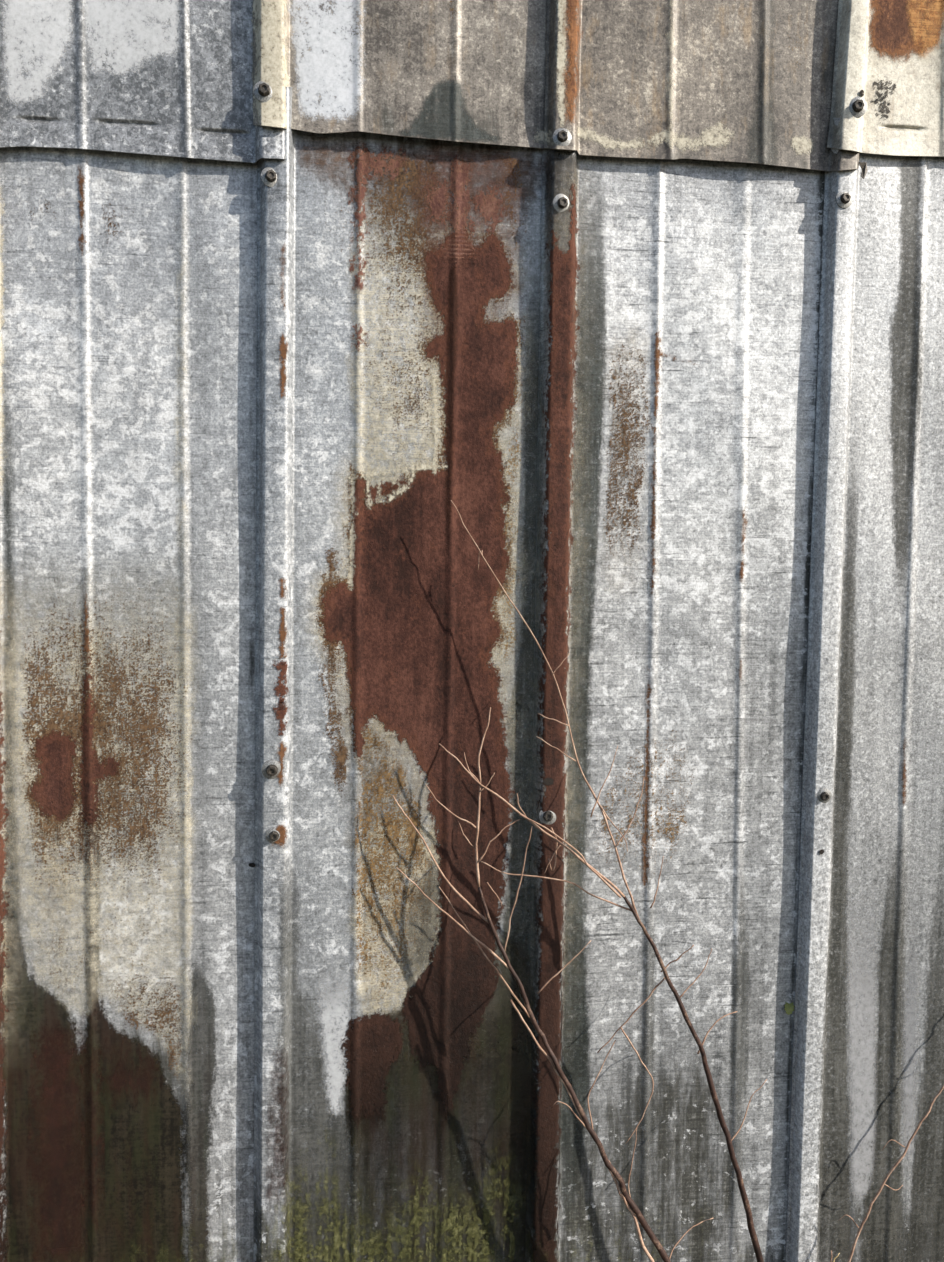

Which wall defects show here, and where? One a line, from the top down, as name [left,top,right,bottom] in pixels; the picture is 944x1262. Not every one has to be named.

rust [0,581,194,1262]
leakage [0,462,217,1262]
rust [302,141,545,1127]
rust [528,180,581,1262]
leakage [817,523,944,1262]
rust [868,0,944,60]
leakage [890,156,922,568]